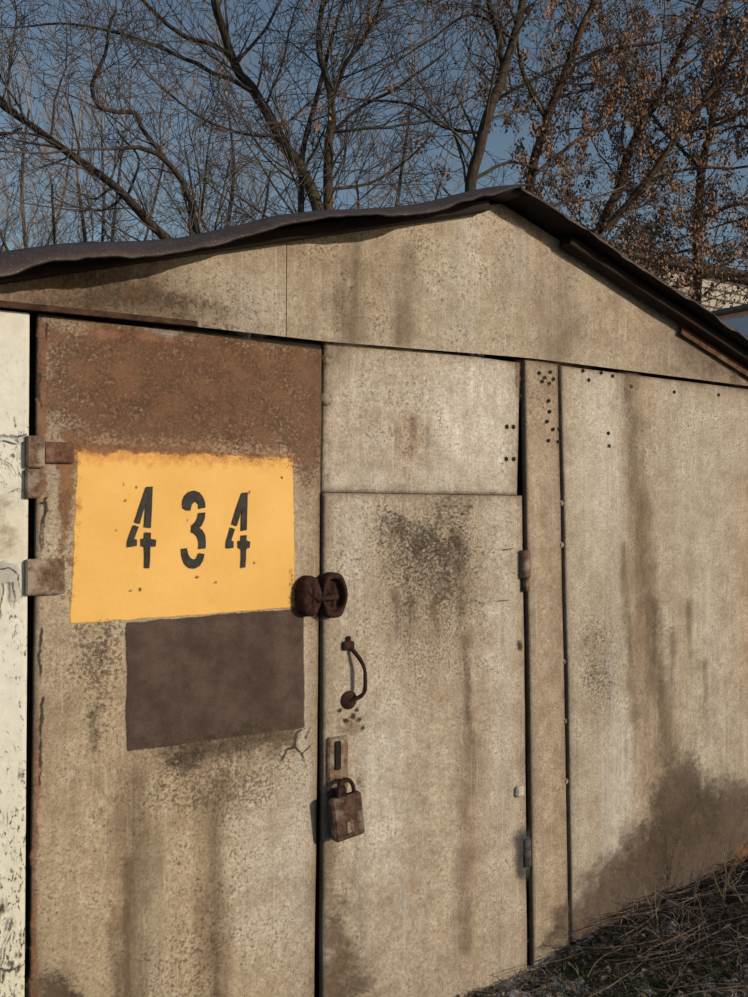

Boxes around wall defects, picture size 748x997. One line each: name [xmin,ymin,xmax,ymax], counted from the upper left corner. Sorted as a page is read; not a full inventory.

rust [36,318,328,562]
water stain [369,485,489,624]
rust [30,697,45,871]
crack [281,726,311,761]